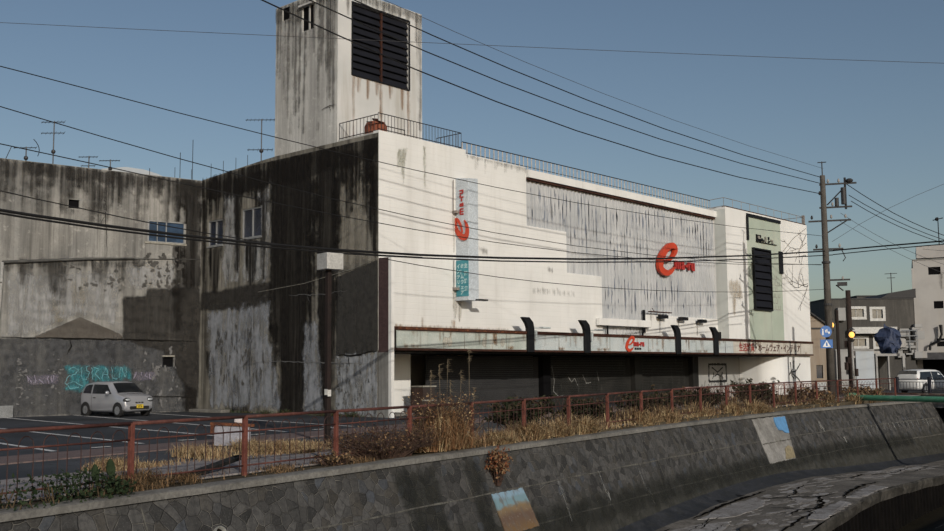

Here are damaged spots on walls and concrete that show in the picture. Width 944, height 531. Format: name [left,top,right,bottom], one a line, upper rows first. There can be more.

water stain [276,0,349,133]
water stain [0,137,378,417]
peeling [208,304,280,410]
peeling [303,320,322,411]
peeling [335,352,377,417]
crack [665,468,925,531]